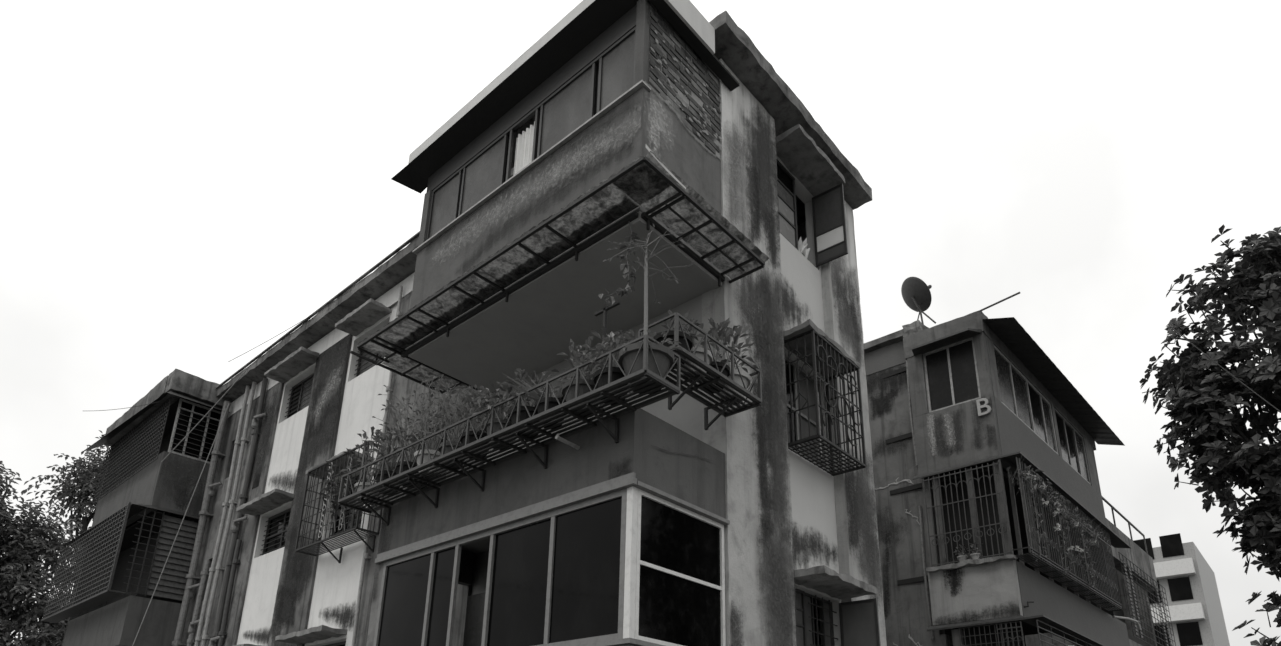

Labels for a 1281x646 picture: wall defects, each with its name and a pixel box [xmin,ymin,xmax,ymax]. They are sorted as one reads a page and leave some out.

water stain [725,106,907,646]